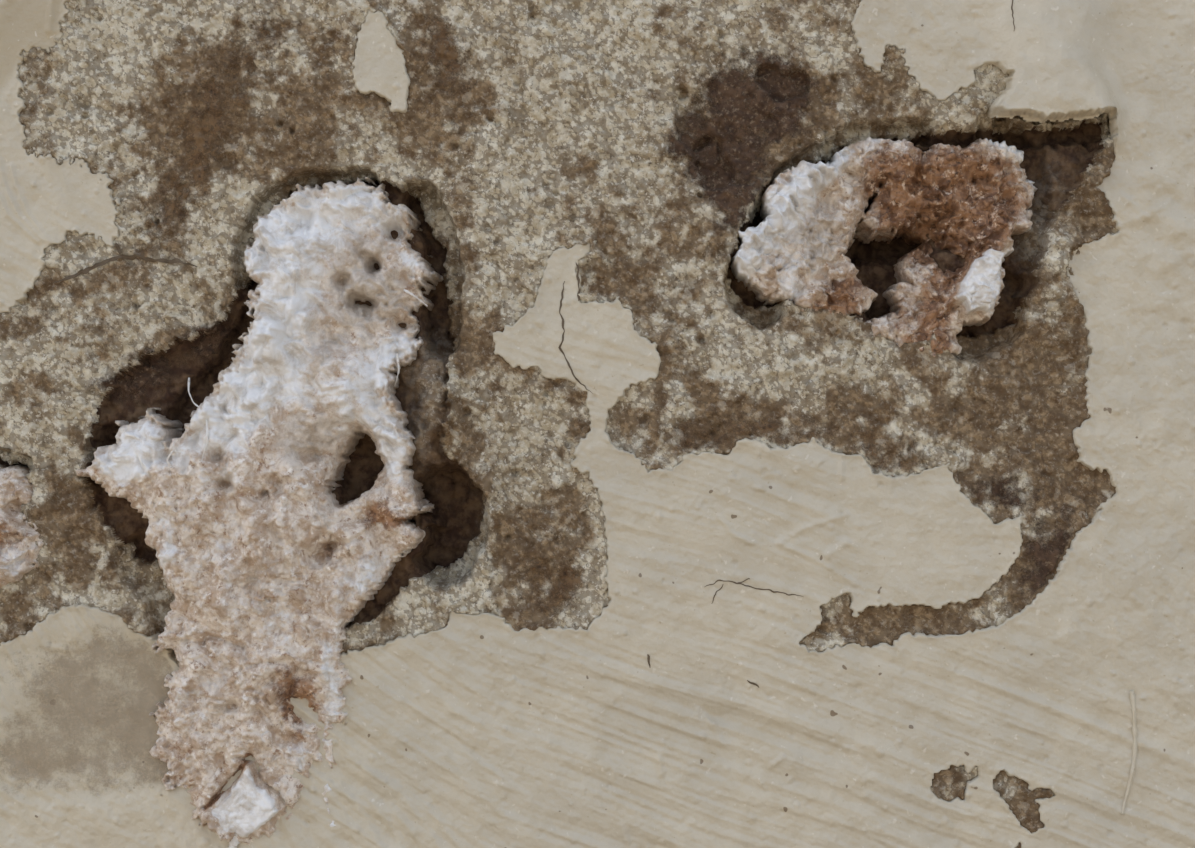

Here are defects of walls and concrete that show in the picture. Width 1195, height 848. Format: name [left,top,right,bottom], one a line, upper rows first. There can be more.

spalling [0,0,1119,653]
damp [667,51,1037,357]
damp [0,464,44,588]
damp [76,177,444,848]
peeling [931,765,978,801]
peeling [993,771,1054,848]